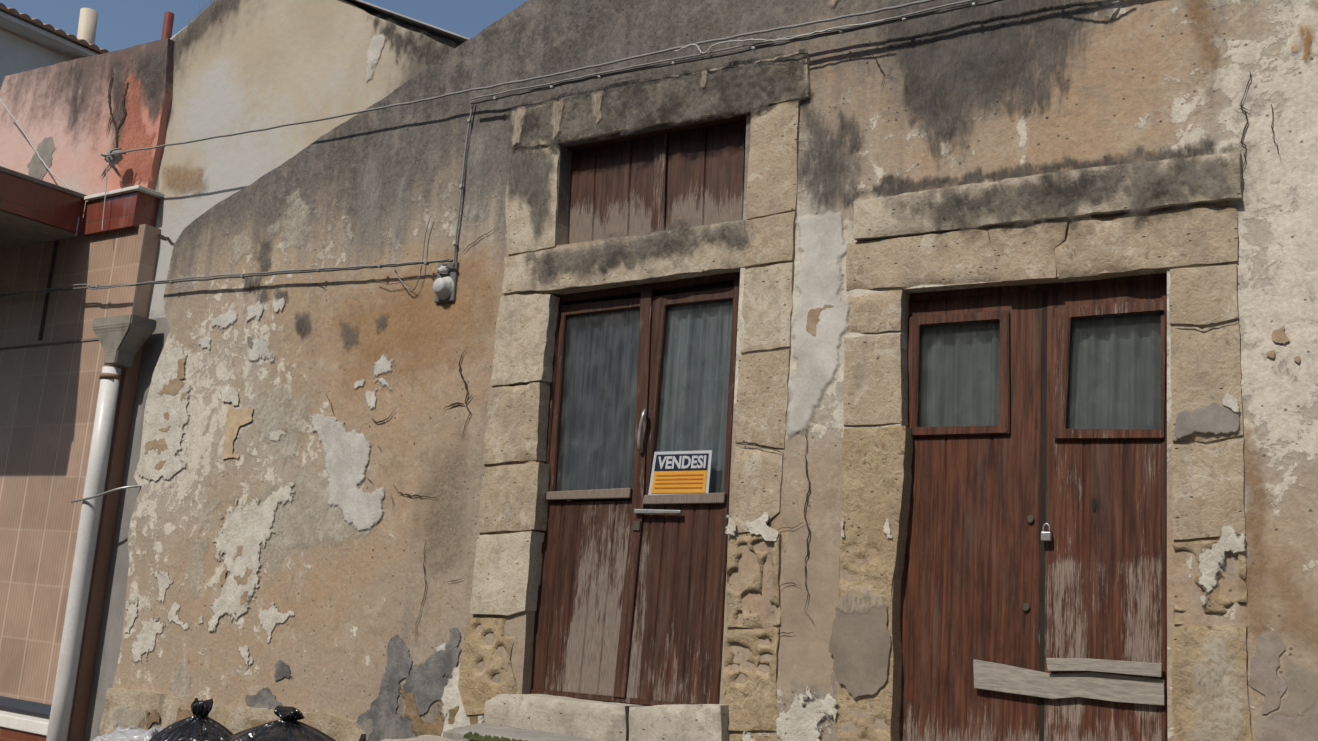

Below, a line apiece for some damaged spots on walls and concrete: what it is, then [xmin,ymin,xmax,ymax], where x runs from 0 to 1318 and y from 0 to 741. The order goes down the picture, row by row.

crack [101,70,128,177]
leakage [109,0,239,149]
leakage [507,49,1237,281]
leakage [886,0,1112,141]
crack [1239,71,1280,191]
corrosion [1293,26,1311,59]
peeling [136,298,285,481]
crack [443,349,472,438]
peeling [125,414,384,662]
crack [735,431,814,634]
spalling [1198,525,1247,605]
flaking render [740,685,838,741]